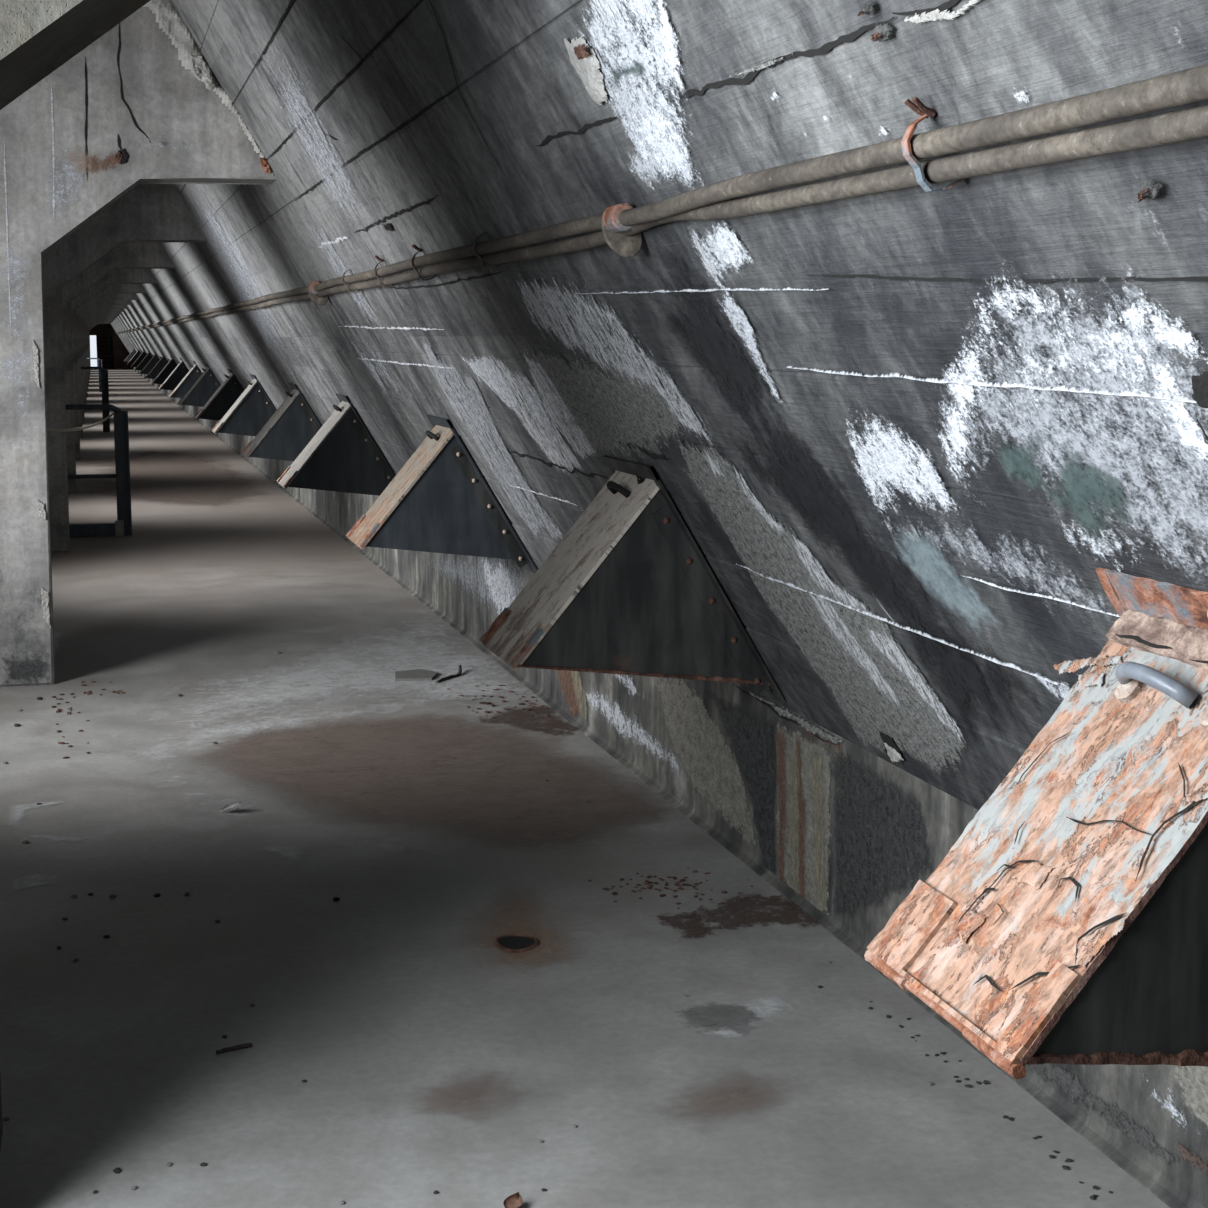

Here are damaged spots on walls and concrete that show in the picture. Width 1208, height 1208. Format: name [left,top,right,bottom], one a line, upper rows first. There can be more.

crack [82,57,90,174]
rust [77,153,116,172]
spalling [143,0,274,176]
crack [266,0,510,233]
spalling [564,36,608,105]
crack [668,0,982,102]
water stain [665,223,1102,736]
water stain [846,273,1208,571]
peeling [1191,371,1208,408]
water stain [201,718,655,843]
rust [477,900,561,963]
rust [1021,1049,1208,1066]